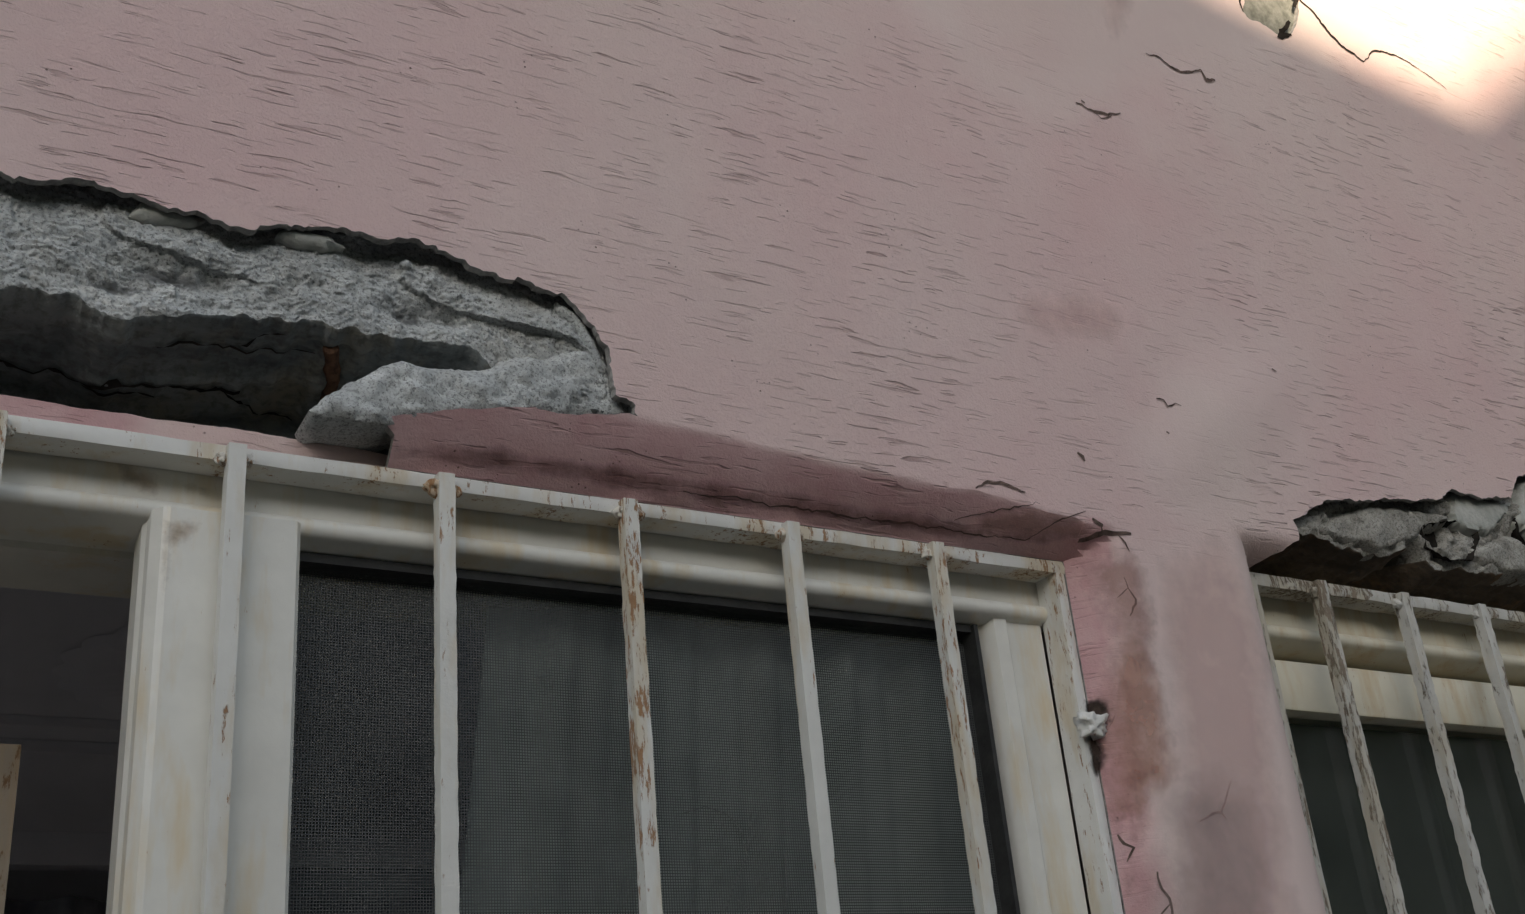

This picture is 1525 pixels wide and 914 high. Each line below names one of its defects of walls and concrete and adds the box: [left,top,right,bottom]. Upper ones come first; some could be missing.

crack [1146,53,1215,82]
spalling [1243,0,1295,34]
crack [1277,0,1447,90]
crack [157,333,315,354]
spalling [0,176,632,455]
crack [0,360,292,421]
spalling [1249,476,1525,612]